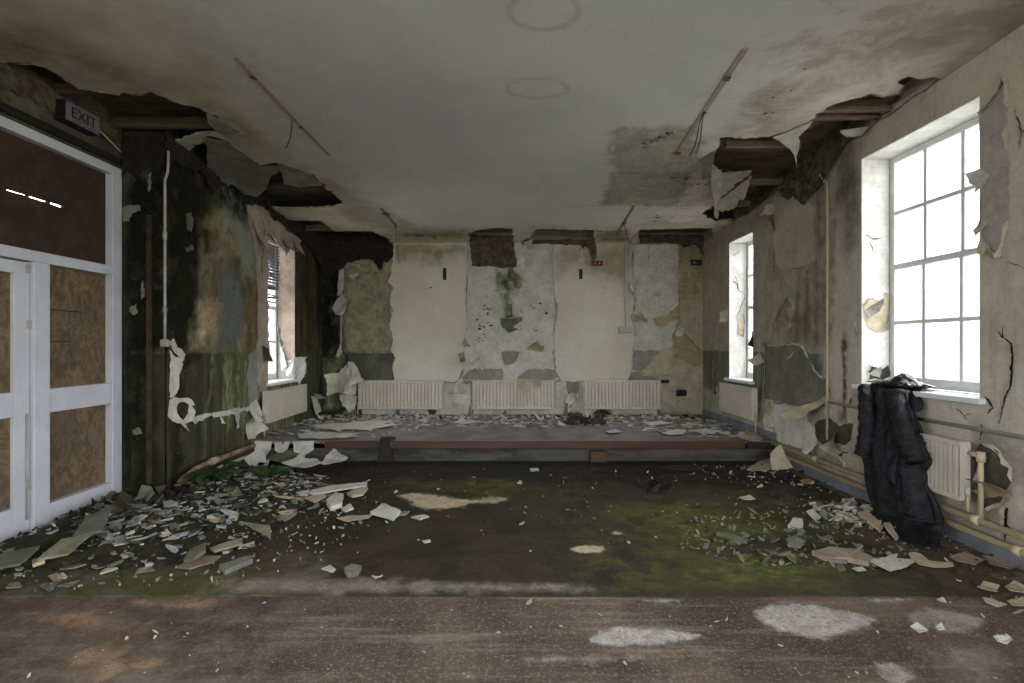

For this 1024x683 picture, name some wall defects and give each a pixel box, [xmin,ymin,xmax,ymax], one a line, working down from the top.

water stain [124,161,252,487]
peeling [0,63,395,380]
spalling [246,298,748,440]
spalling [469,235,597,270]
water stain [604,128,697,204]
peeling [719,309,852,475]
peeling [854,290,891,337]
crack [954,326,1014,440]
peeling [965,75,1010,260]
peeling [965,442,1013,511]